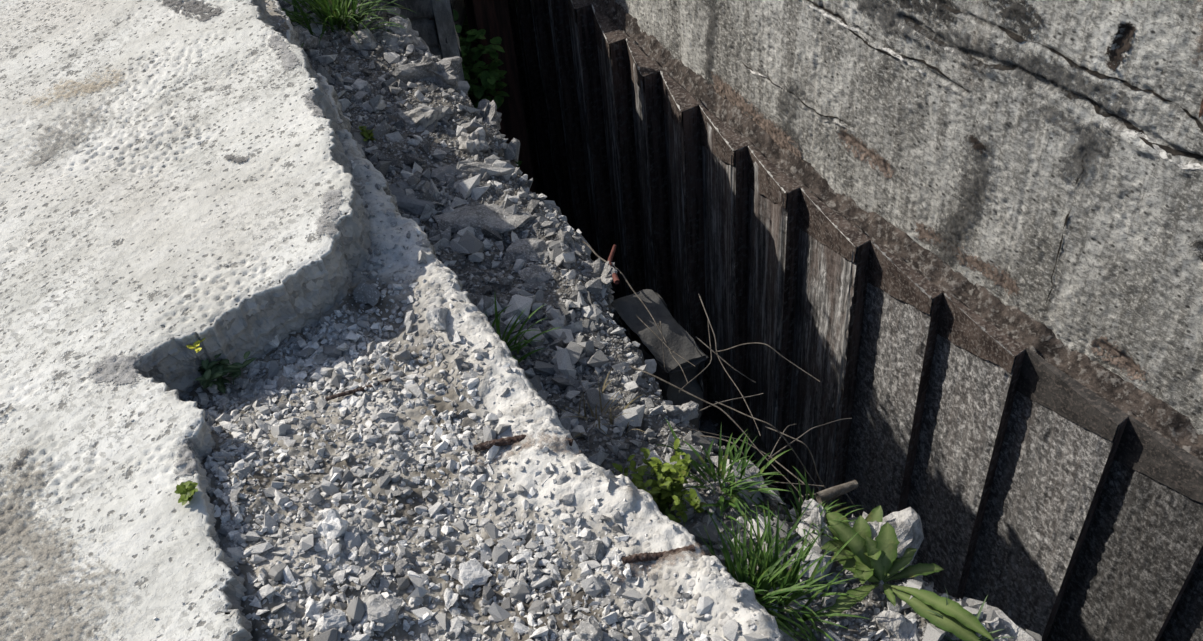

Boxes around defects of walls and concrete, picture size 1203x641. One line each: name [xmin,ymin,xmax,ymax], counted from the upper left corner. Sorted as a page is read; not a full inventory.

crack [938,2,1203,132]
crack [1045,156,1086,304]